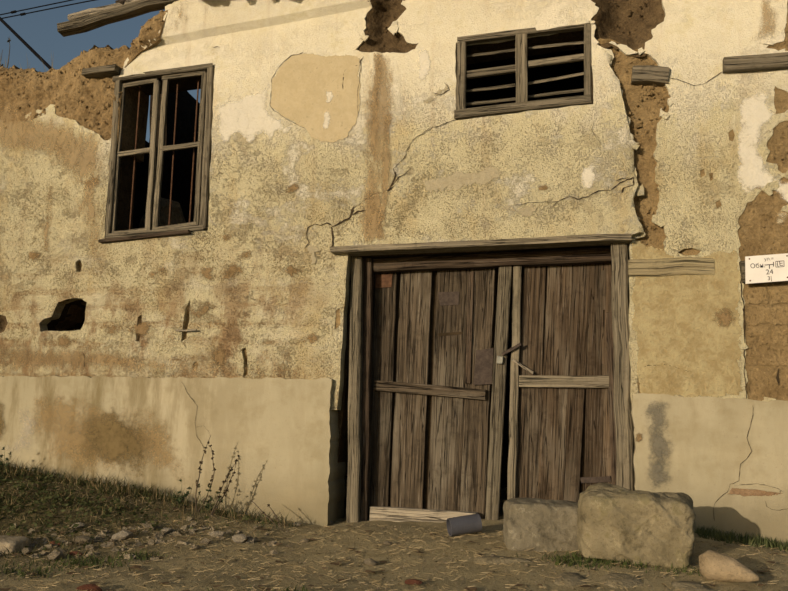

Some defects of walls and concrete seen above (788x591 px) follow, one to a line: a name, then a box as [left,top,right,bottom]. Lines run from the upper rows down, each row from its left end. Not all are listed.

peeling [218,0,417,143]
damp [365,54,390,239]
crack [306,120,455,247]
peeling [582,166,595,188]
peeling [589,0,788,401]
spalling [47,300,86,347]
spalling [182,302,209,341]
crack [739,278,747,398]
damp [21,400,171,472]
damp [647,404,669,485]
crack [713,416,783,521]
spalling [729,485,782,496]